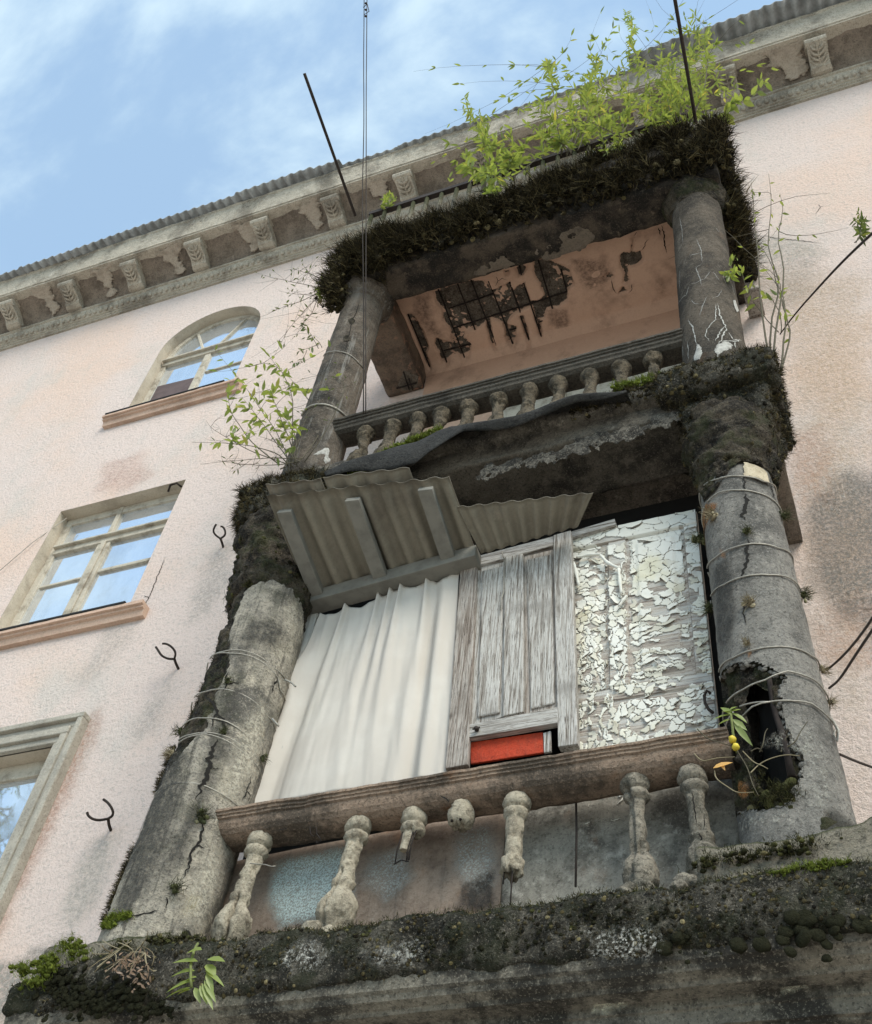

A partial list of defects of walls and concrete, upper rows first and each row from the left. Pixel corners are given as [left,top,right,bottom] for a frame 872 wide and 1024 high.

peeling [297,197,324,230]
peeling [31,284,60,318]
peeling [90,264,118,297]
peeling [156,243,186,275]
flaking render [407,226,595,367]
flaking render [603,245,642,292]
crack [635,209,739,360]
spalling [476,411,681,482]
crack [728,474,775,623]
peeling [566,442,808,818]
crack [195,673,239,800]
crack [183,824,204,878]